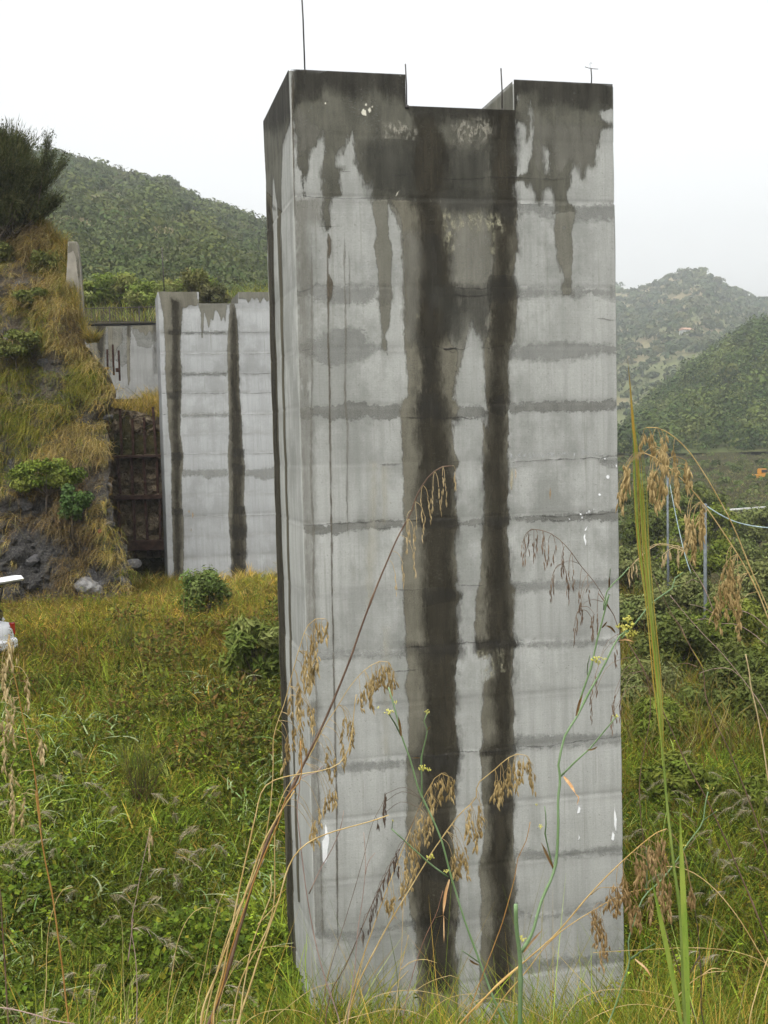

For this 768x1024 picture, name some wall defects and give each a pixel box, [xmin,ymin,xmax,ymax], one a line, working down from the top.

leakage [84,69,623,1024]